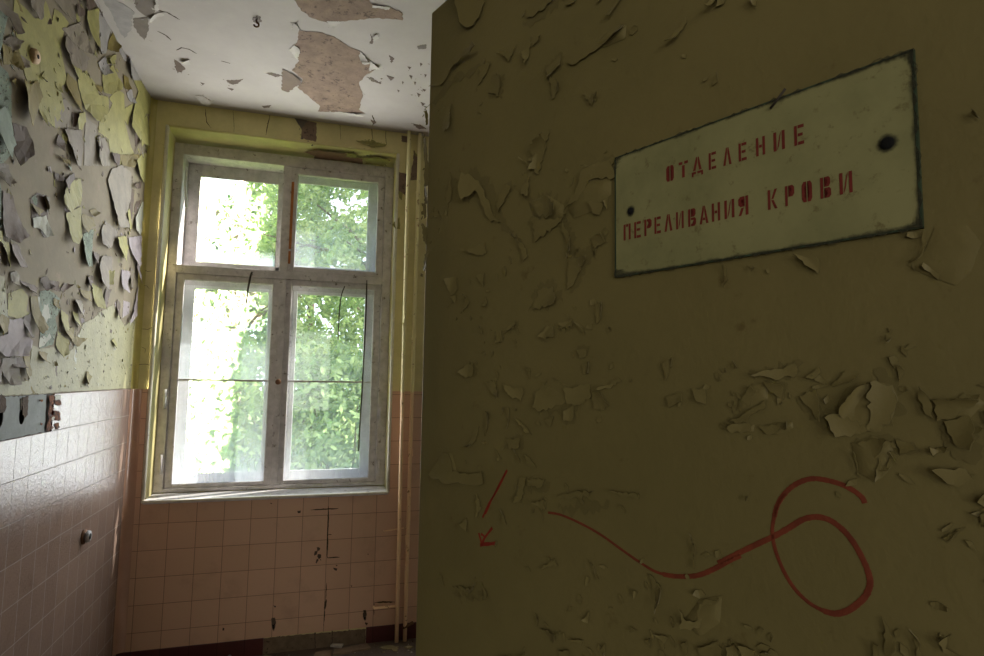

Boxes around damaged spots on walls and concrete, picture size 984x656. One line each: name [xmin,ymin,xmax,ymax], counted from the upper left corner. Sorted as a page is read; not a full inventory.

peeling [0,0,164,441]
spalling [174,59,191,75]
peeling [266,0,434,277]
crack [313,506,340,558]